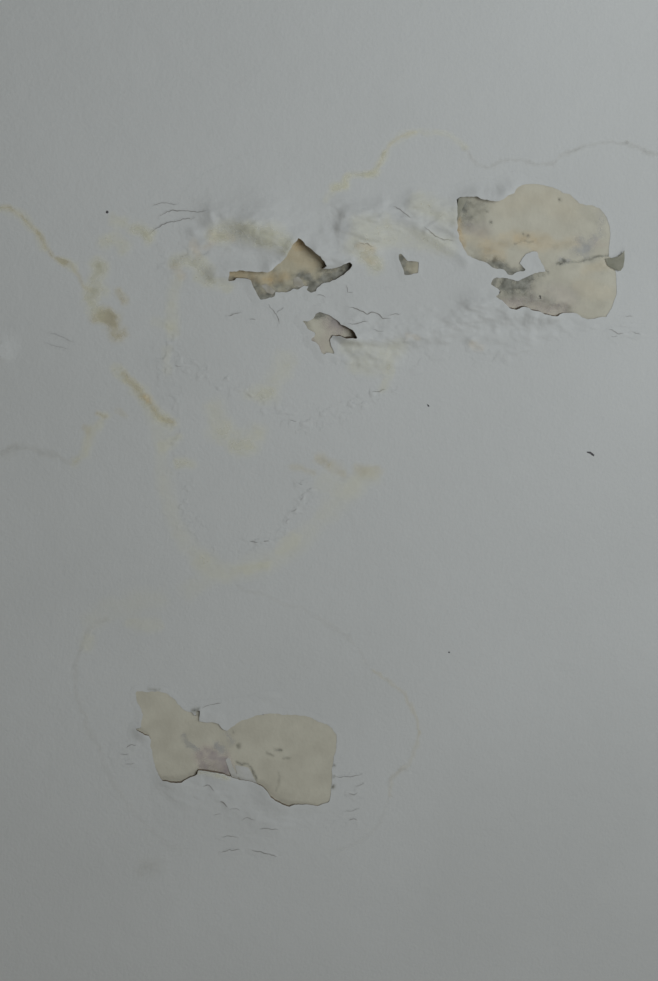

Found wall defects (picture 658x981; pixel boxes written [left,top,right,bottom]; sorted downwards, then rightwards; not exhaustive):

peeling [228,238,357,362]
peeling [395,249,424,282]
peeling [453,171,625,331]
peeling [127,684,343,818]